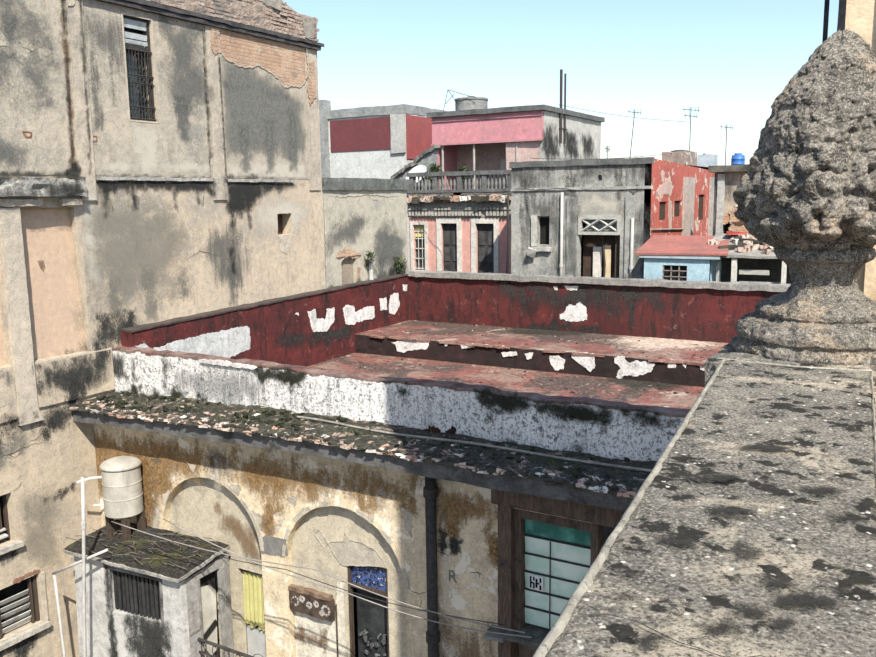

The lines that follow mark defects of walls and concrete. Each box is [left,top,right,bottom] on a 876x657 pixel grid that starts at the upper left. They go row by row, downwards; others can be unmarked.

flaking render [210,27,316,106]
water stain [0,0,308,441]
water stain [512,123,647,272]
peeling [296,284,408,332]
peeling [392,340,429,353]
peeling [501,345,533,360]
peeling [549,352,596,372]
peeling [560,302,587,322]
water stain [498,275,666,323]
water stain [512,320,718,351]
water stain [0,416,26,468]
water stain [104,564,171,657]